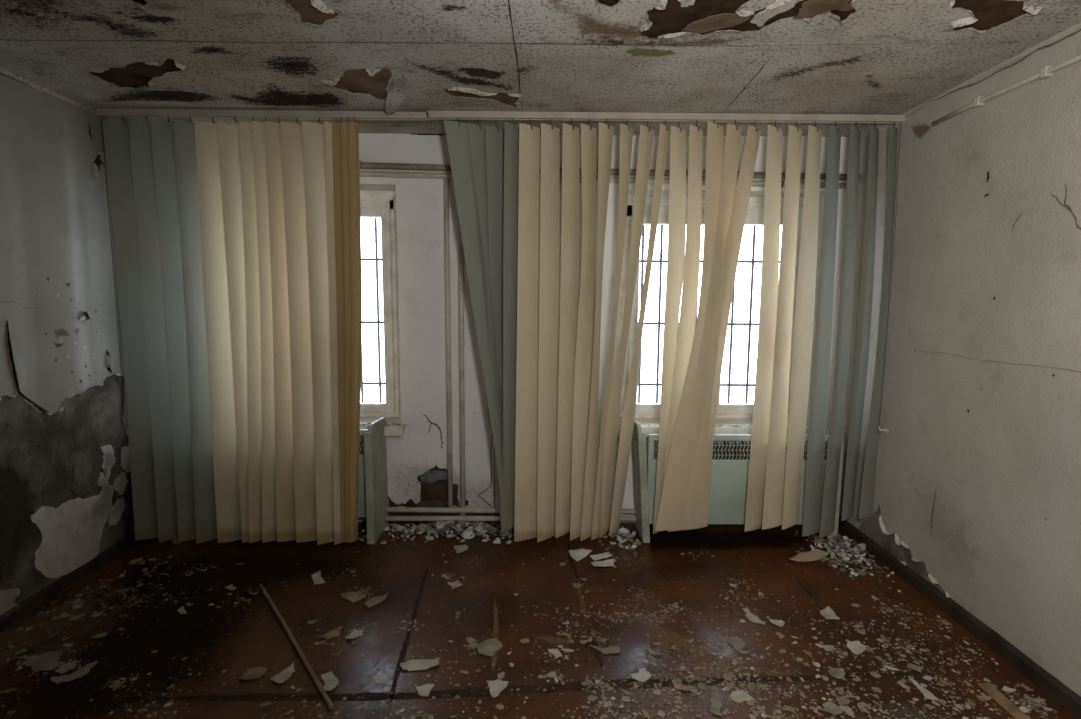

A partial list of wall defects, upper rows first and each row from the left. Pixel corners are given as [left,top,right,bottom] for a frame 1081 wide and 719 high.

water stain [0,0,185,40]
peeling [640,0,856,38]
peeling [947,0,1042,33]
peeling [84,57,186,89]
water stain [166,45,234,55]
water stain [110,55,346,108]
water stain [406,62,534,90]
water stain [774,55,865,80]
crack [1050,185,1081,230]
crack [19,392,49,415]
spalling [0,283,135,607]
spalling [388,463,500,522]